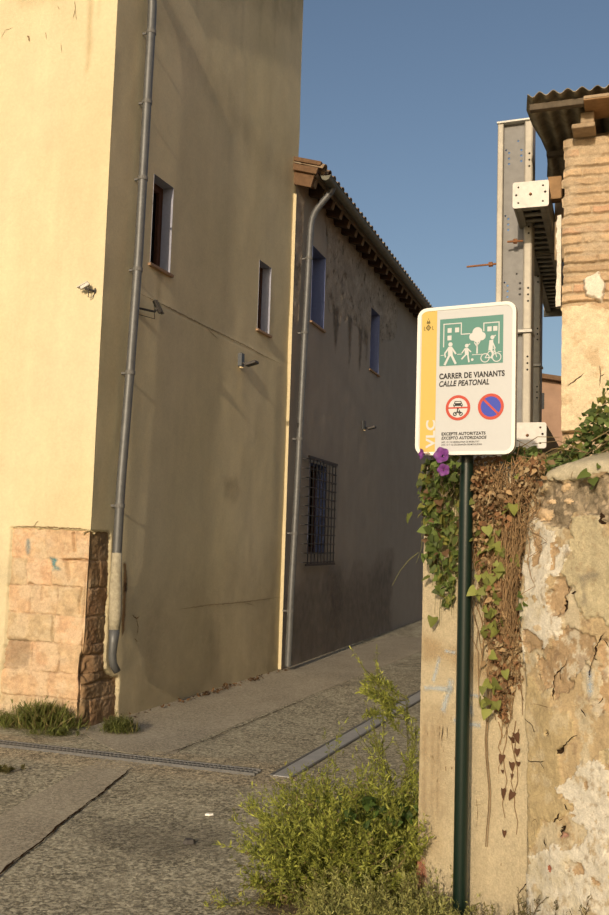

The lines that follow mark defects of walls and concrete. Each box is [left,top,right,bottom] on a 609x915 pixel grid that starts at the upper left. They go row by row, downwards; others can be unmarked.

peeling [519,473,609,717]
peeling [526,748,609,915]